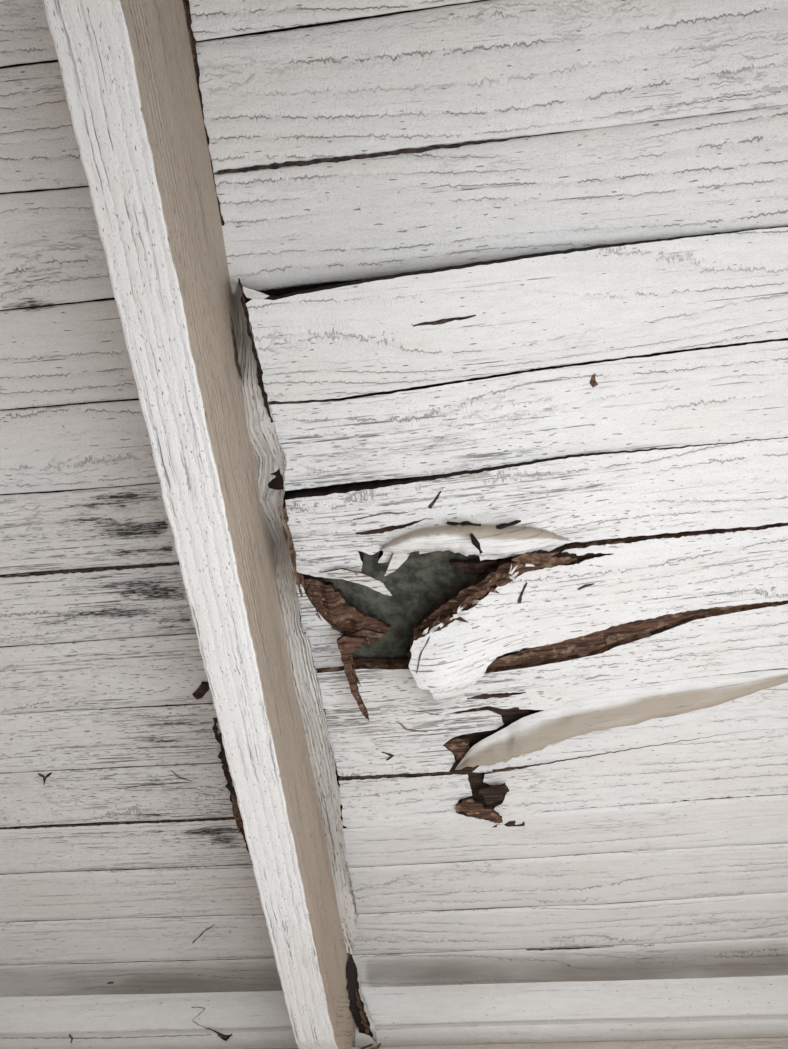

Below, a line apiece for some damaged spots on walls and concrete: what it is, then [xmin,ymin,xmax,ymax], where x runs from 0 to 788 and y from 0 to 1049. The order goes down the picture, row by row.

peeling [323,552,411,596]
spalling [421,544,578,625]
crack [517,582,527,603]
peeling [456,783,509,824]